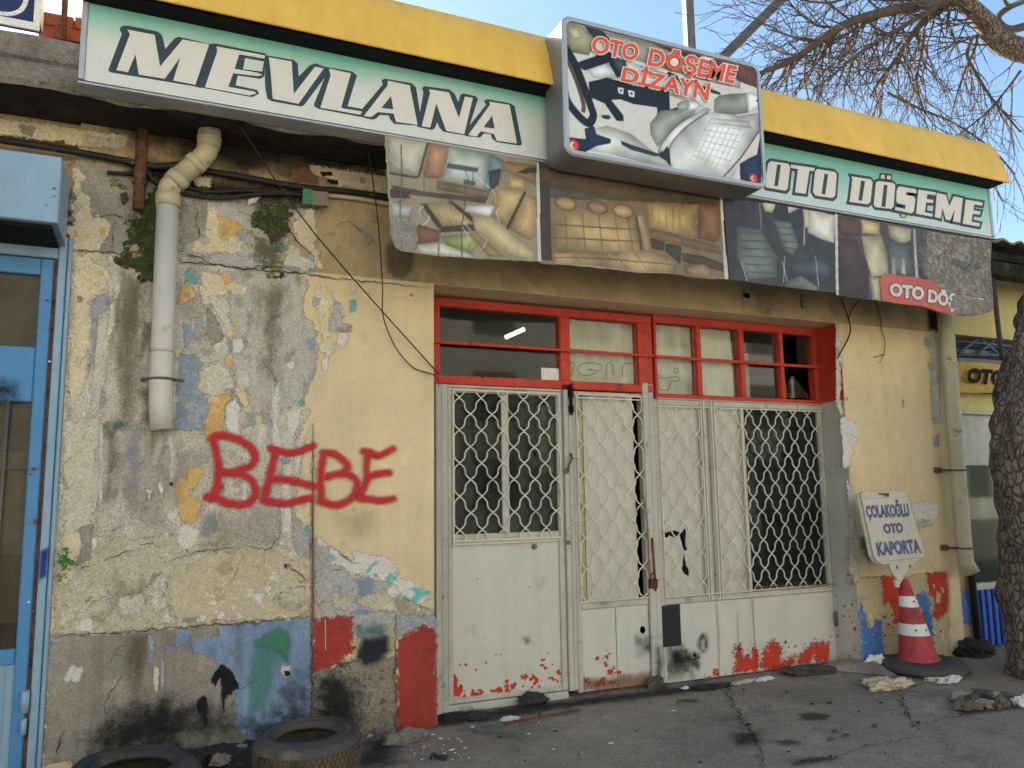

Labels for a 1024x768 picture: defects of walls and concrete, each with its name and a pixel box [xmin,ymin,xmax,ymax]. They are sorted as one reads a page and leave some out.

crack [182,201,430,288]
crack [51,428,353,716]
flaking render [0,118,434,739]
peeling [704,322,899,679]
crack [722,681,765,764]